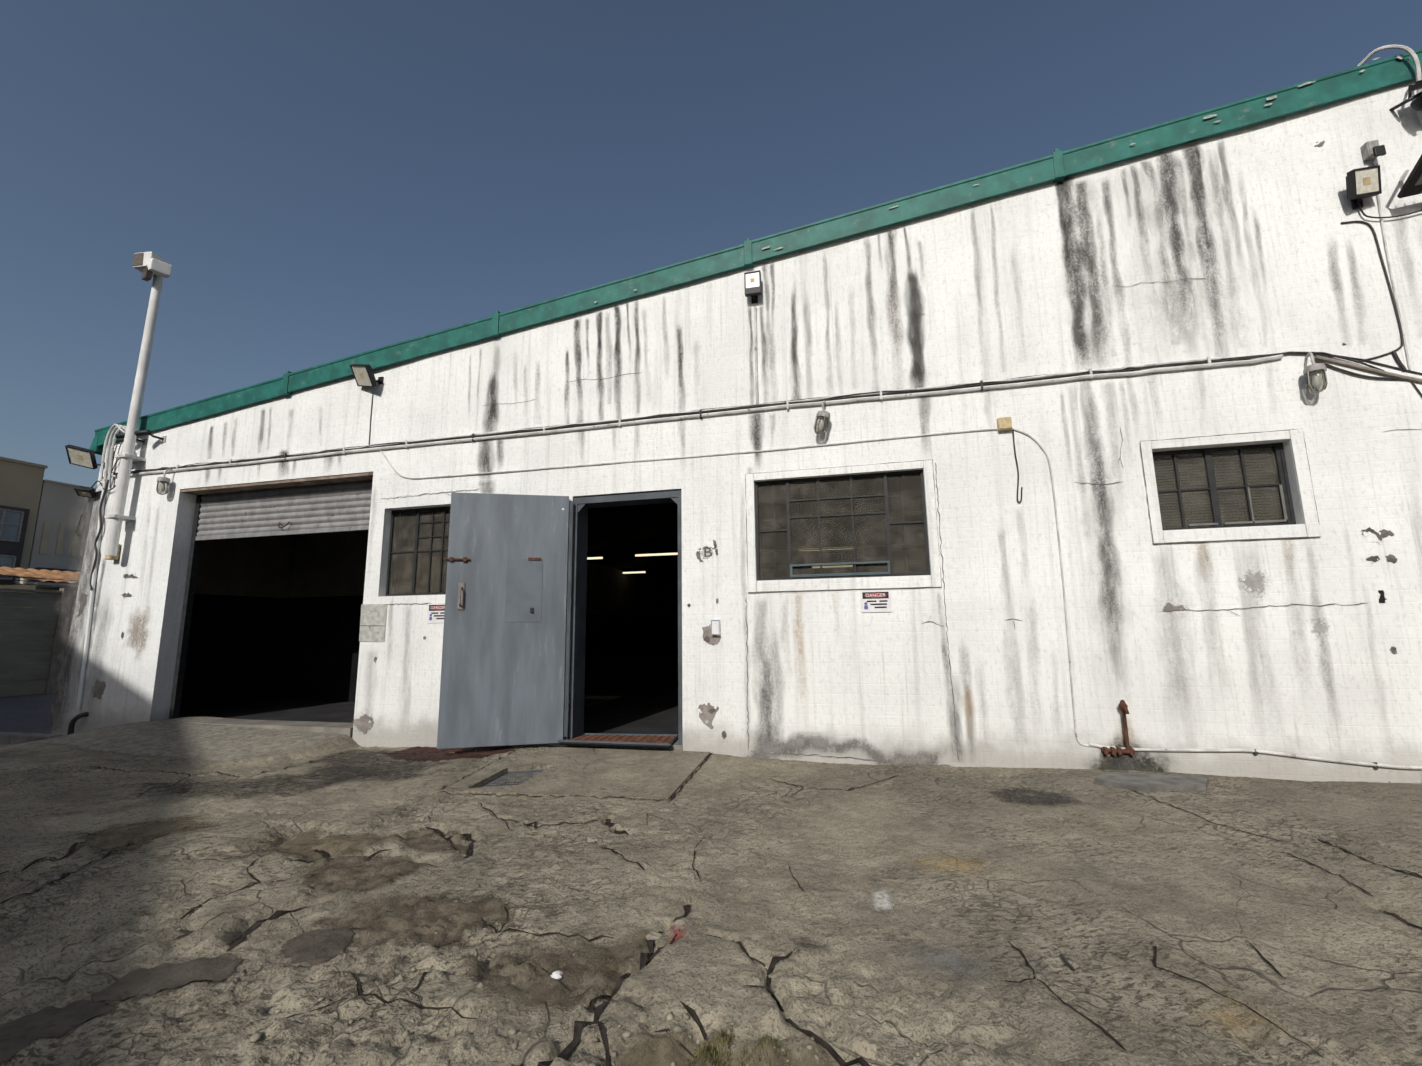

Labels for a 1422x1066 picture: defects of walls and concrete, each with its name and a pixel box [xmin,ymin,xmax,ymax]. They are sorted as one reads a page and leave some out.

leakage [566,305,640,406]
leakage [889,228,925,407]
leakage [1057,176,1101,357]
leakage [1160,145,1213,295]
flaking render [698,702,727,739]
leakage [752,735,937,766]
crack [180,849,335,952]
crack [1133,790,1422,930]
crack [353,973,478,1019]
crack [481,918,663,1066]
crack [680,1001,709,1048]
crack [766,951,870,1066]